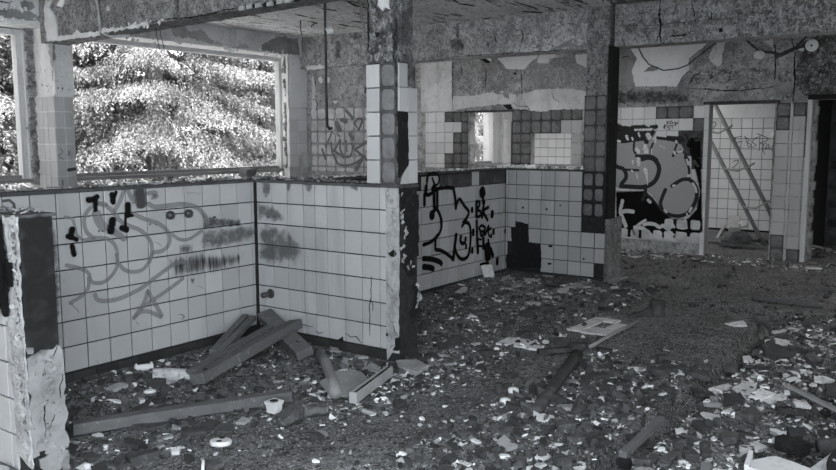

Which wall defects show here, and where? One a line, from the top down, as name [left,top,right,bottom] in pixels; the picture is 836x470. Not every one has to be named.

spalling [0,0,40,27]
crack [618,0,734,42]
crack [689,70,776,91]
peeling [369,0,415,360]
peeling [439,36,607,216]
peeling [617,106,704,185]
peeling [506,221,552,268]
peeling [2,215,71,470]